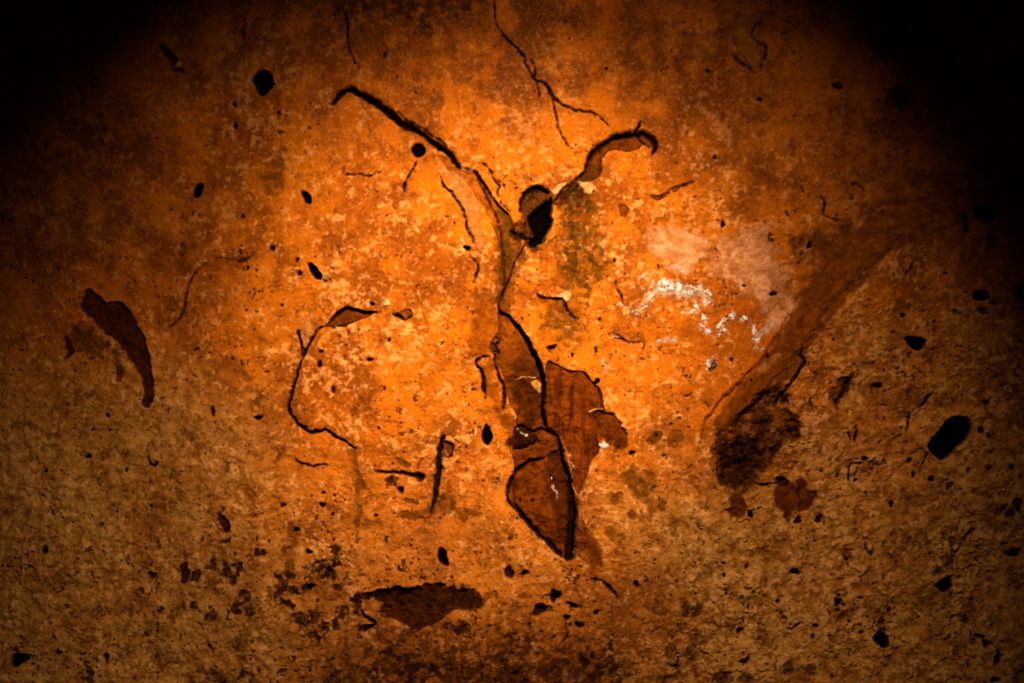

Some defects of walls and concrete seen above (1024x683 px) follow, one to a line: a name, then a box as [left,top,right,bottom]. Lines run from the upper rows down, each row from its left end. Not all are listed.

crack [493,0,658,179]
crack [331,13,548,430]
spalling [63,288,154,408]
crack [287,325,355,449]
spalling [439,157,635,561]
crack [537,291,576,319]
water stain [618,264,773,349]
crack [375,436,480,525]
spalling [273,544,498,643]